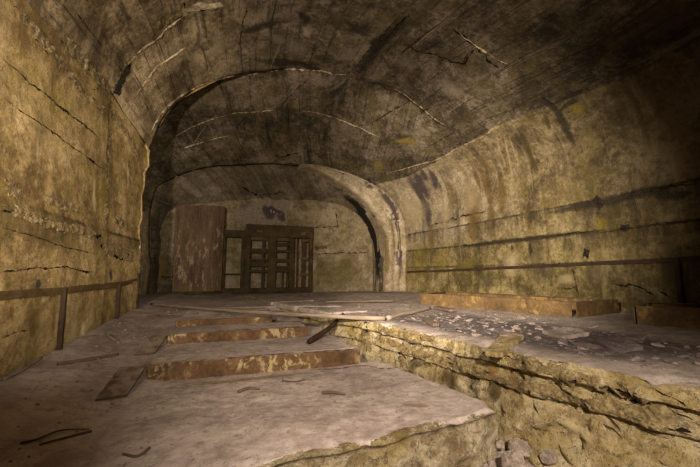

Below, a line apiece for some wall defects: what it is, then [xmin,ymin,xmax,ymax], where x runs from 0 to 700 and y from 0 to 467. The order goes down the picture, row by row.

crack [342,13,531,81]
crack [3,35,138,254]
crack [366,82,454,148]
damp [409,170,437,248]
damp [452,231,589,254]
crack [616,283,670,297]
crack [318,321,693,438]